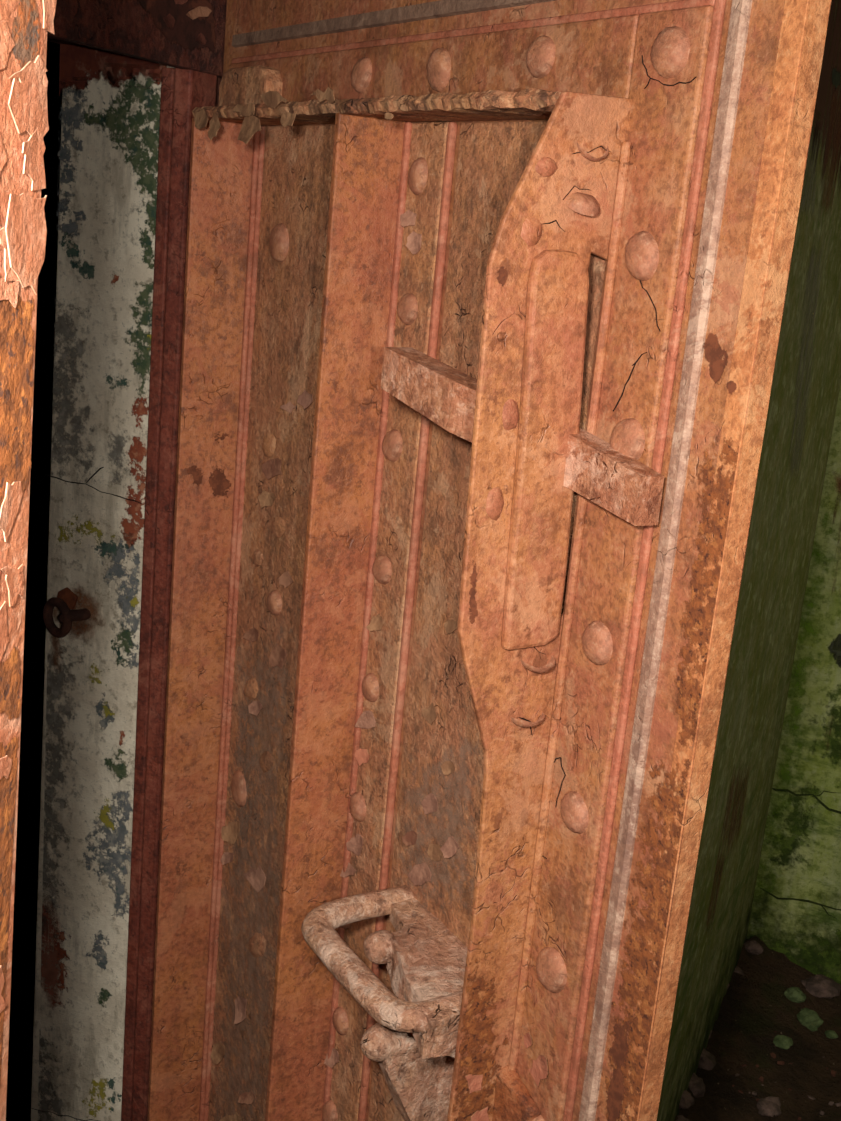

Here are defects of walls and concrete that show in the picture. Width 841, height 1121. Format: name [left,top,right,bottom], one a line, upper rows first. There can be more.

peeling [0,20,49,308]
damp [801,128,819,212]
corrosion [497,266,508,286]
corrosion [703,333,737,394]
corrosion [187,465,231,502]
corrosion [469,561,478,624]
corrosion [675,438,738,745]
peeling [0,564,24,720]
damp [828,634,841,667]
corrosion [598,759,691,1121]
crack [760,888,841,918]
corrosion [452,956,509,1121]